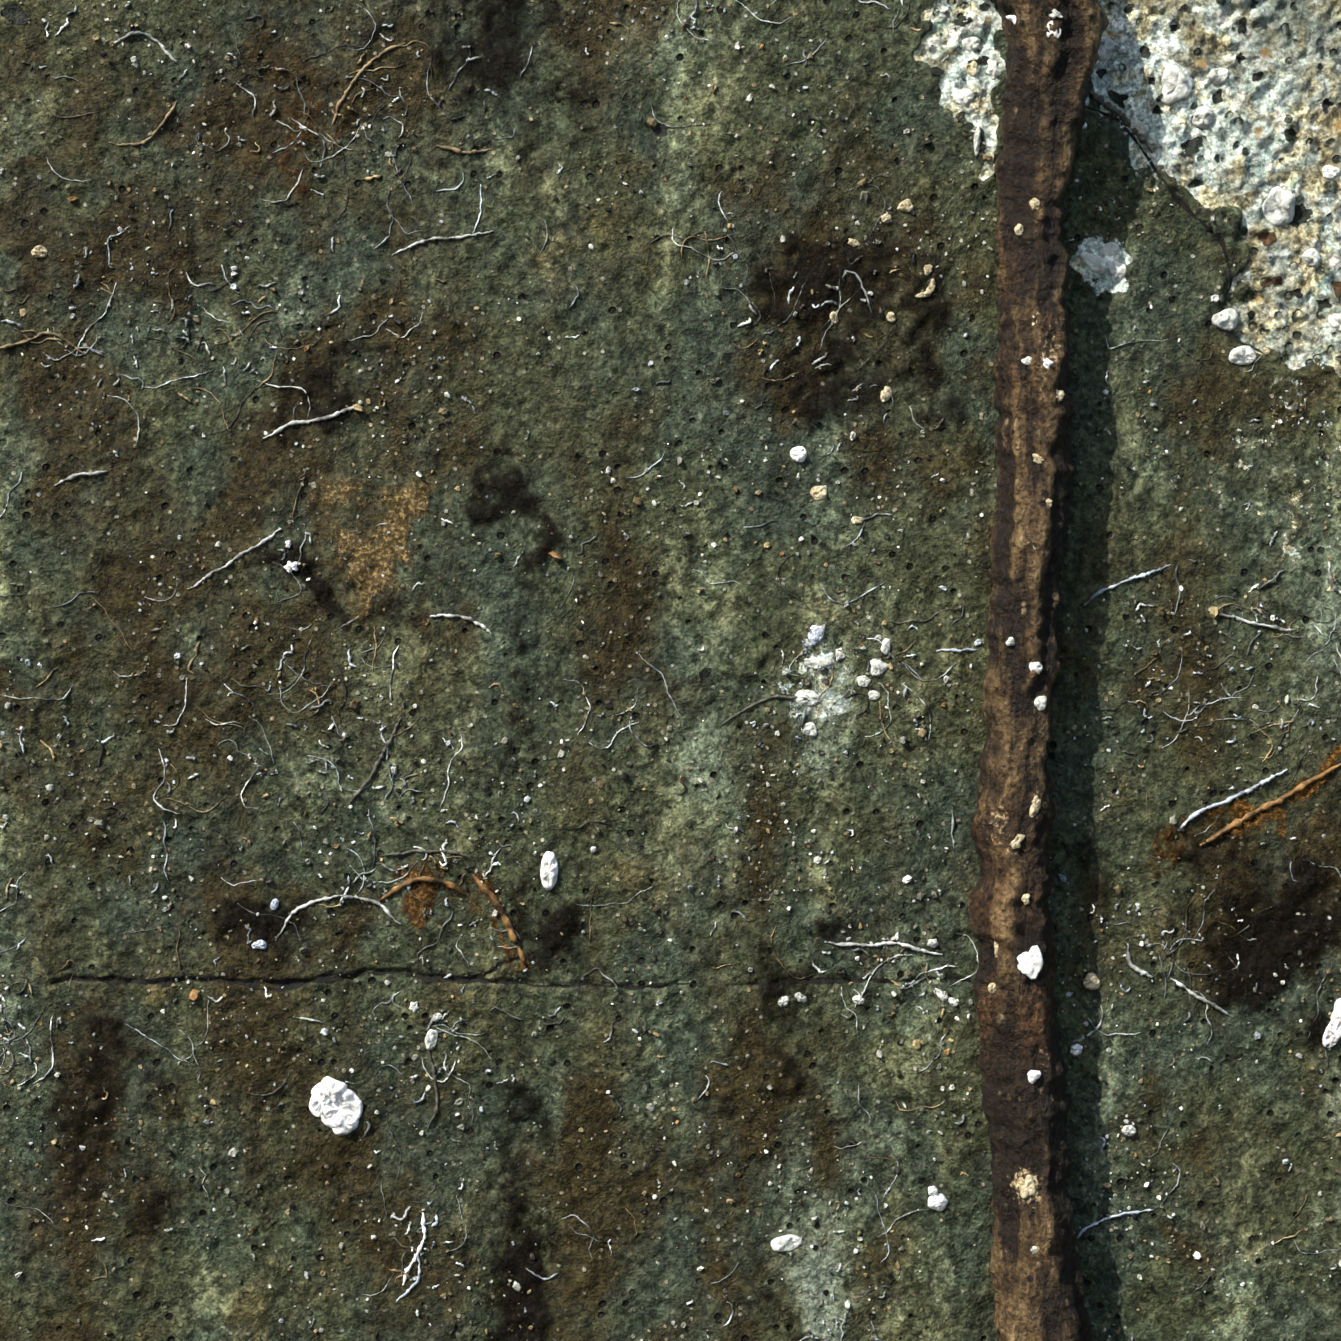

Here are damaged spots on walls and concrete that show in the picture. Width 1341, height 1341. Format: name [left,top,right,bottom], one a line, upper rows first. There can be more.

spalling [914,0,1006,181]
damp [750,236,969,446]
spalling [1069,235,1133,297]
crack [1086,106,1270,357]
spalling [1086,0,1341,470]
spalling [1257,475,1315,564]
corrosion [1206,745,1341,837]
crack [52,956,972,991]
damp [1205,826,1341,1015]
damp [1305,1009,1330,1052]
damp [483,1079,553,1341]